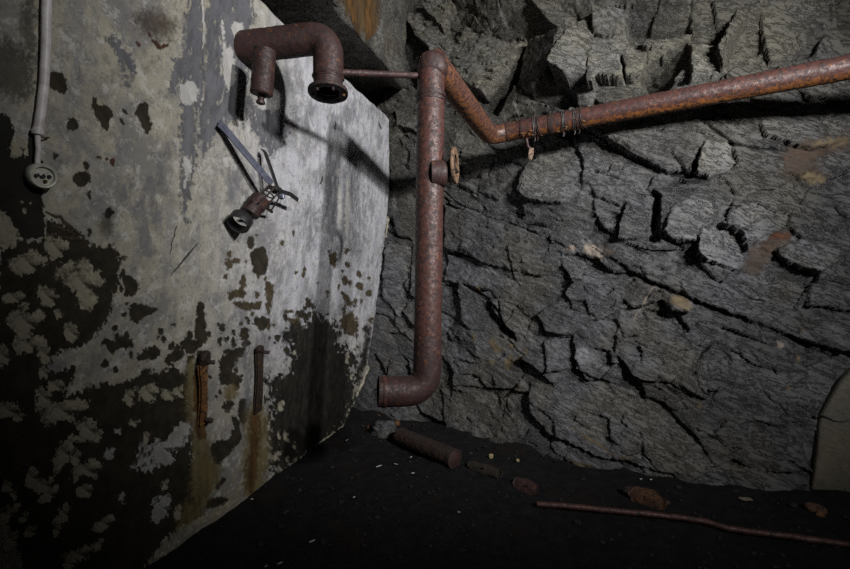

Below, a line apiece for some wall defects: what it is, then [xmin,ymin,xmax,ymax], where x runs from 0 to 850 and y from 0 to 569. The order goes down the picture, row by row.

spalling [50,72,68,94]
spalling [73,161,91,199]
spalling [92,97,153,134]
peeling [326,149,372,336]
crack [387,221,411,241]
crack [450,285,531,359]
crack [594,119,785,181]
crack [595,208,838,357]
peeling [0,211,275,569]
corrosion [174,359,222,534]
corrosion [225,380,270,496]
leakage [263,298,374,478]